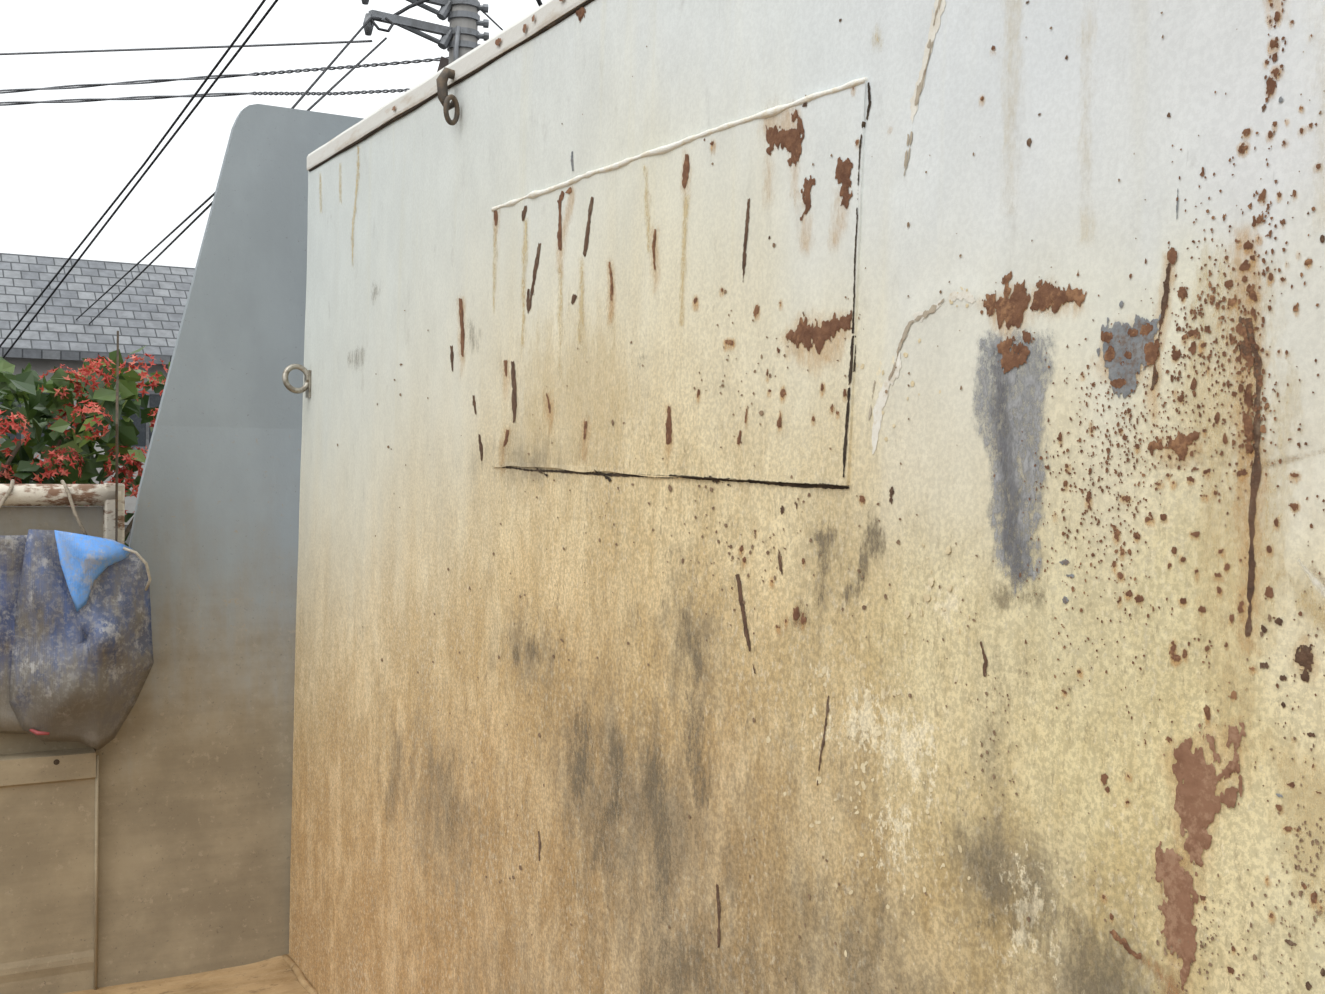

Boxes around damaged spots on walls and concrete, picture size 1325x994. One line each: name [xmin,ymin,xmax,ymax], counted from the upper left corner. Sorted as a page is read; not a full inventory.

rust [765,95,815,221]
rust [830,139,859,209]
rust [720,296,864,444]
rust [980,267,1099,374]
rust [1019,0,1325,720]
leakage [995,381,1026,583]
rust [965,646,1018,796]
rust [1093,627,1325,994]